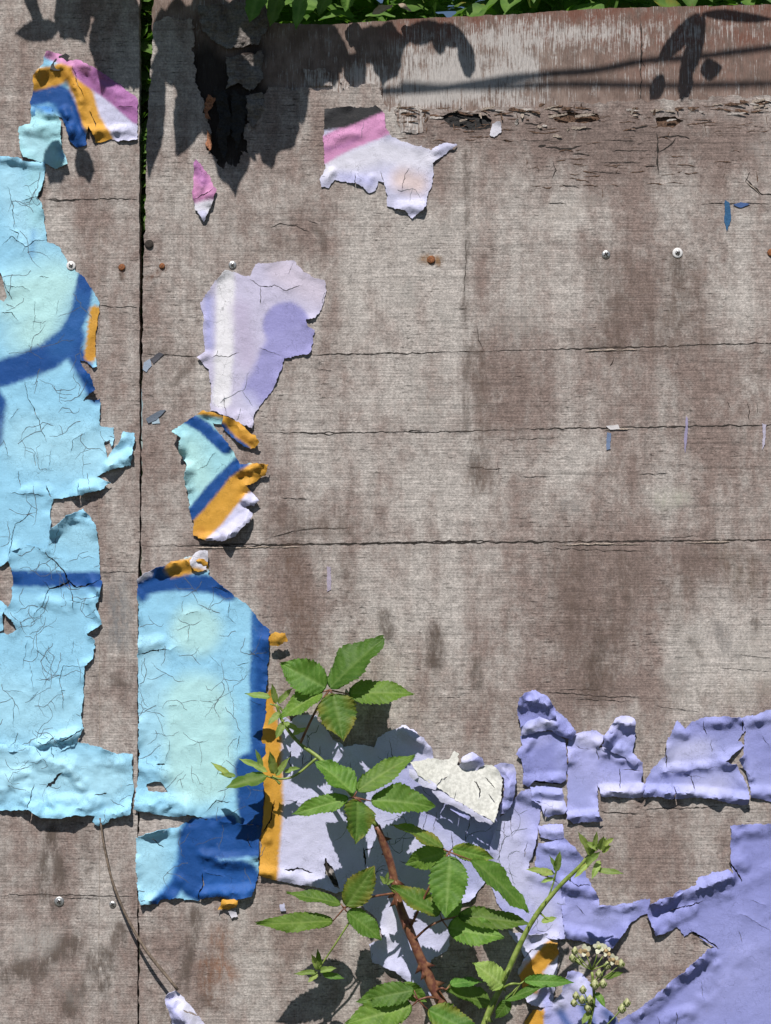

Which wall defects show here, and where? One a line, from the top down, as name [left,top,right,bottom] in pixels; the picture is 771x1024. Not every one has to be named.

peeling [320,105,457,219]
peeling [490,121,501,137]
peeling [0,50,138,826]
peeling [172,260,327,541]
crack [270,401,771,440]
crack [310,328,770,371]
crack [143,527,771,552]
peeling [133,550,771,1024]